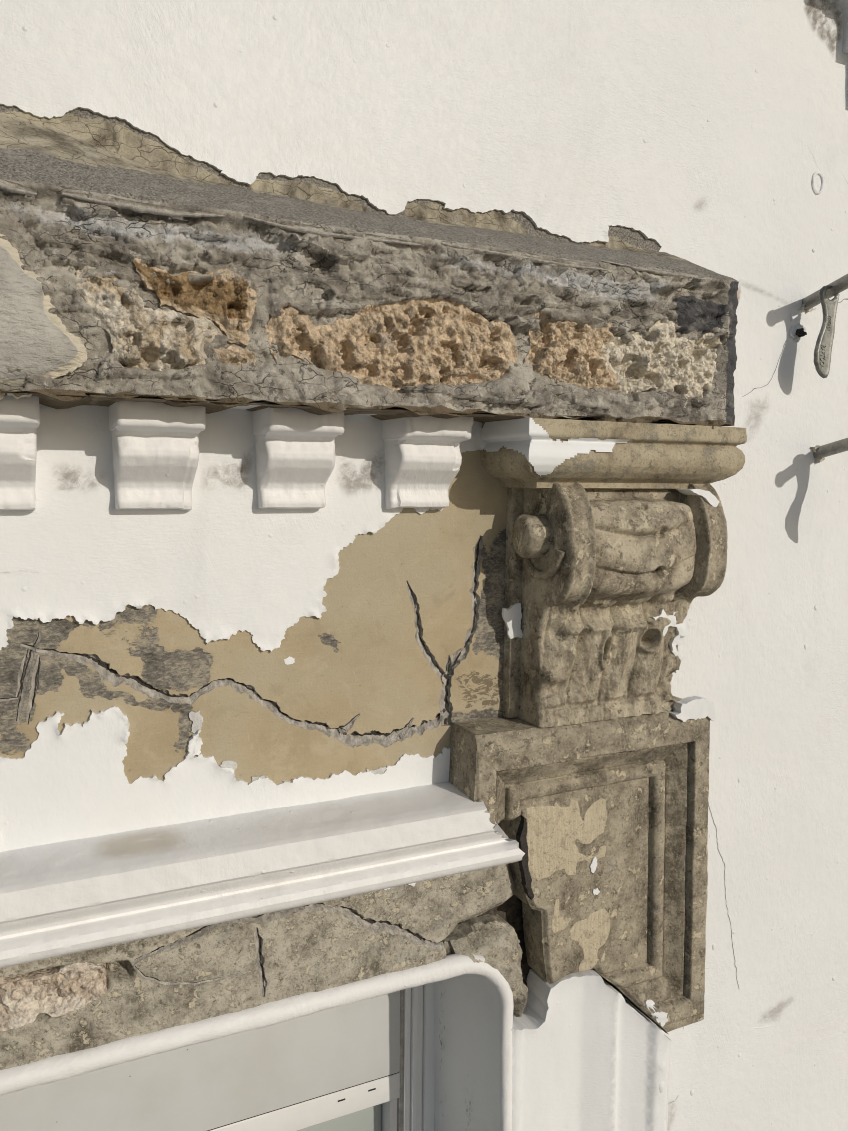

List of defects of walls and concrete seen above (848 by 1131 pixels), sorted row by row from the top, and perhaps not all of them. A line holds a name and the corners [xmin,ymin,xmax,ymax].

spalling [76,258,722,399]
crack [0,536,483,748]
peeling [0,450,523,785]
crack [131,903,455,997]